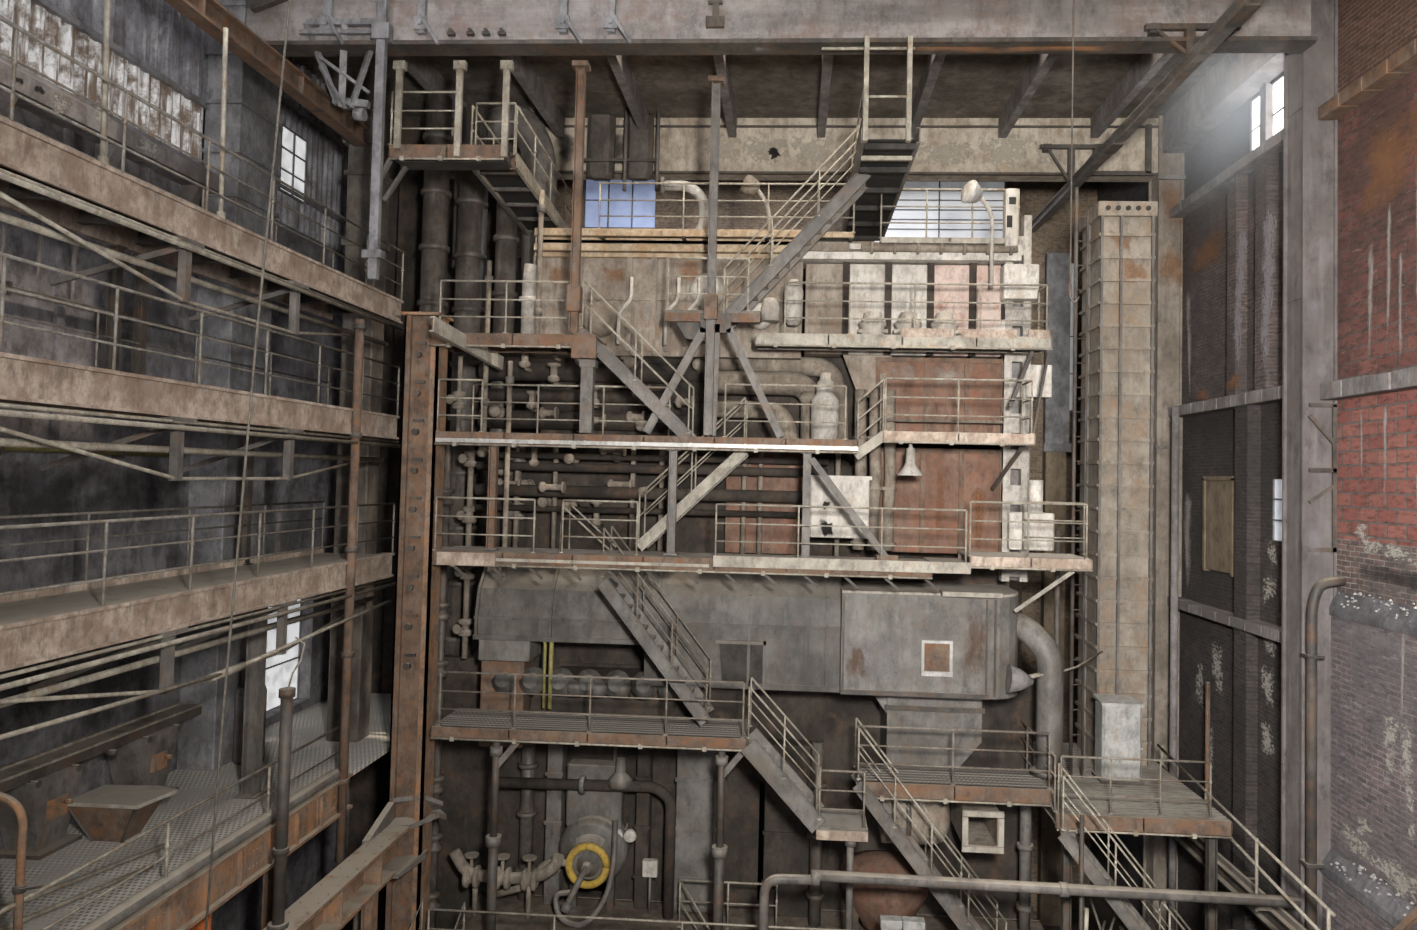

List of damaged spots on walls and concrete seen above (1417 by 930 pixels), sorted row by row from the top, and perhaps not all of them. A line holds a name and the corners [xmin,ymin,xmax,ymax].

peeling [16,78,71,114]
water stain [1233,209,1276,372]
efflorescence [1368,209,1402,336]